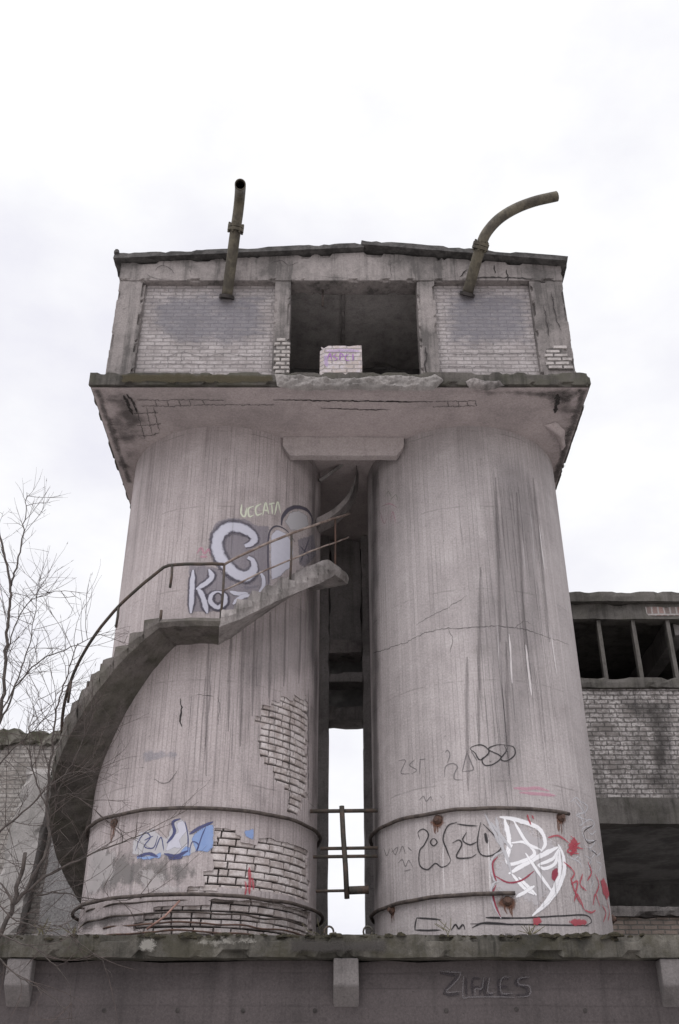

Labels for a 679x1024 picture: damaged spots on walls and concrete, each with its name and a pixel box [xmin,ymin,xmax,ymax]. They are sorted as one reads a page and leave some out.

spalling [544,346,574,370]
spalling [134,399,272,439]
crack [375,598,569,653]
crack [179,694,220,726]
spalling [255,695,308,815]
spalling [81,828,310,936]
rust [499,897,515,917]